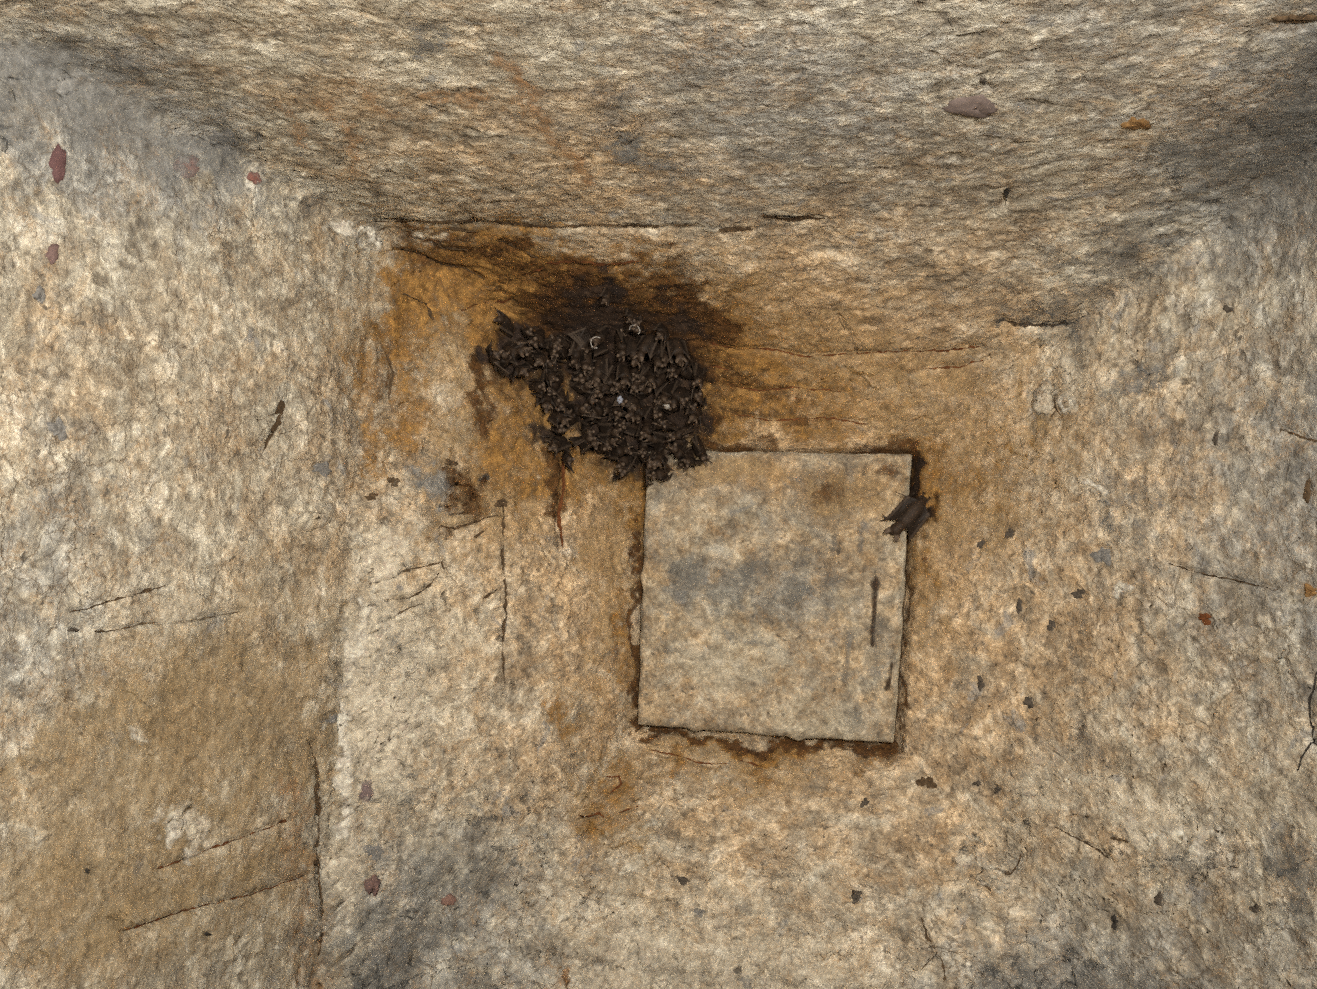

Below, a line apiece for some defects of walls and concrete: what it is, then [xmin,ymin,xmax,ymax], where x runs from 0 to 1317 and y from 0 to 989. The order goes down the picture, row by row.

crack [1280,428,1317,442]
corrosion [342,217,911,781]
corrosion [851,437,1001,536]
corrosion [904,540,937,622]
crack [1297,671,1317,771]